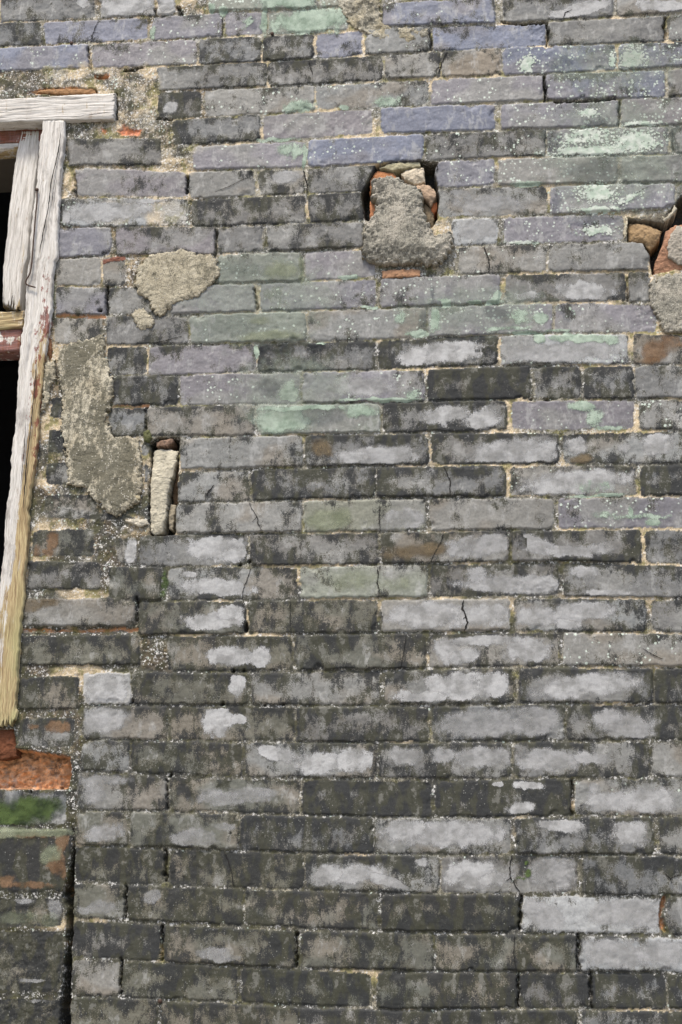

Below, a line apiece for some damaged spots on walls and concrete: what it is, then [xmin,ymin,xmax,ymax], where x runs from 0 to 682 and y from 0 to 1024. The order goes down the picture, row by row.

spalling [370,162,438,228]
peeling [627,211,682,334]
peeling [40,334,180,536]
crack [460,600,468,631]